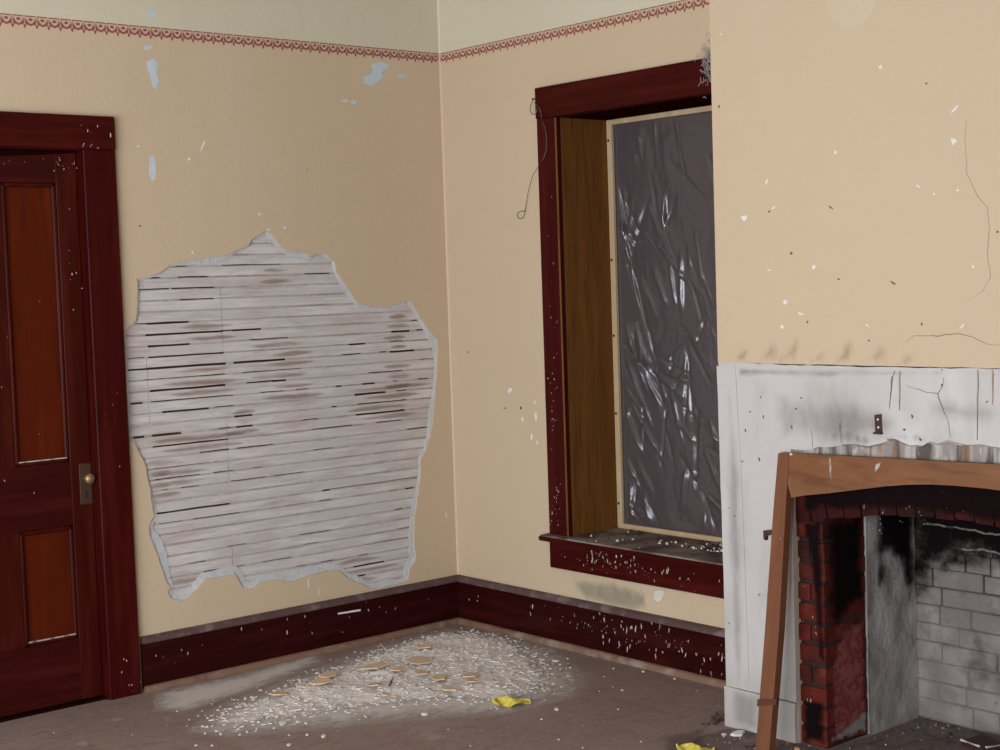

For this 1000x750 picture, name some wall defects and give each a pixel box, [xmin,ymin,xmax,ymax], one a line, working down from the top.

peeling [143,45,159,89]
peeling [363,61,389,86]
crack [965,120,991,300]
crack [910,333,993,345]
spalling [124,228,437,601]
crack [843,371,999,448]